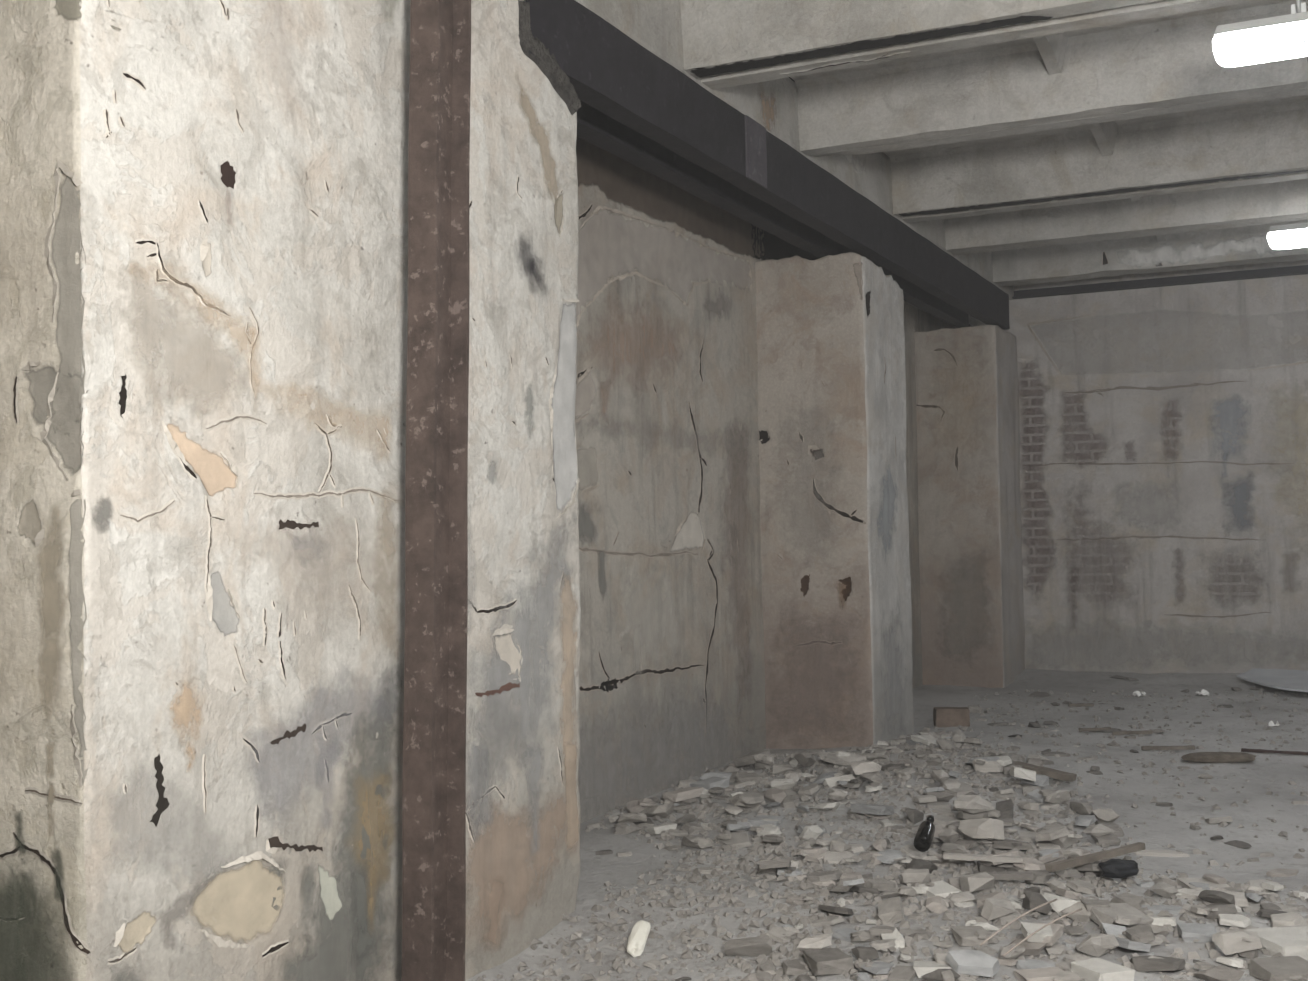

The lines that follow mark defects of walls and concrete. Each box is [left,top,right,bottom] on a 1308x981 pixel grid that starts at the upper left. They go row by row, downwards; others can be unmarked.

crack [135,238,267,431]
spalling [161,421,242,496]
crack [579,340,748,737]
crack [812,479,866,524]
flaking render [206,571,241,636]
flaking render [475,629,522,697]
leakage [16,814,25,852]
crack [25,787,84,806]
leakage [0,870,60,981]
leakage [54,852,63,898]
crack [0,831,137,965]
spalling [191,836,342,949]